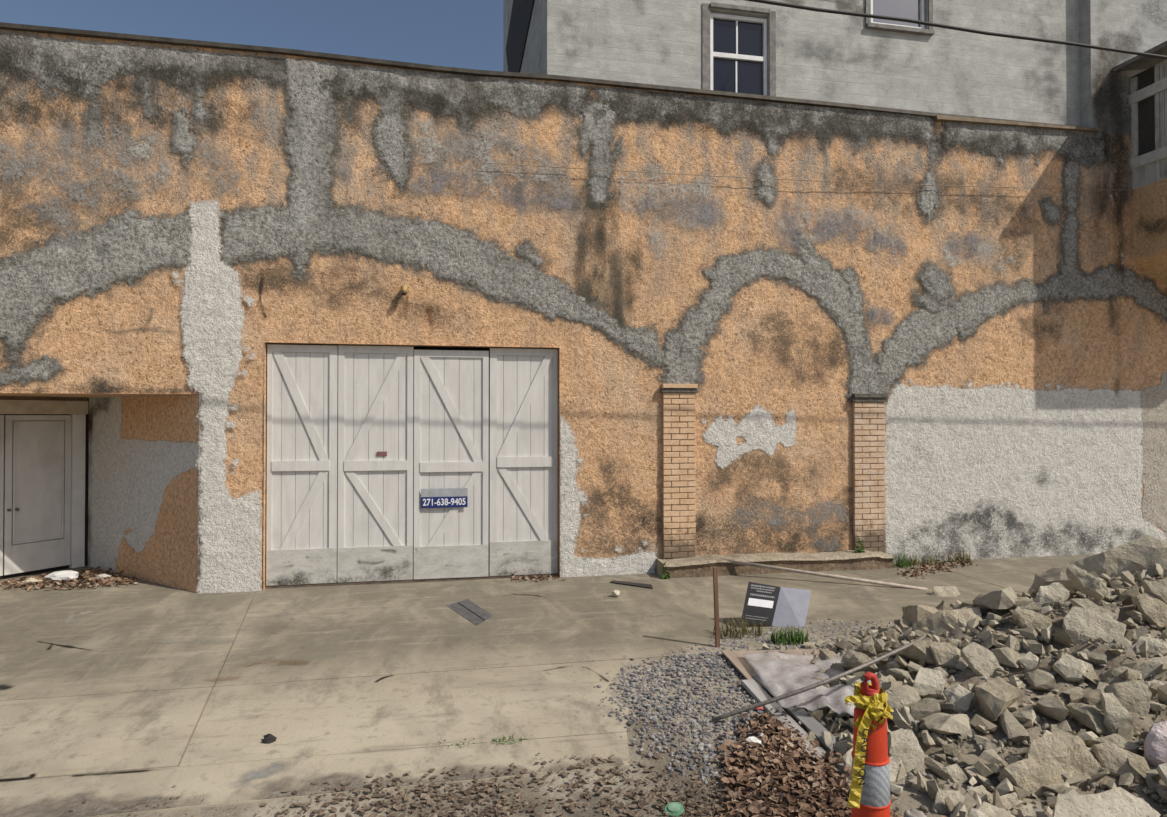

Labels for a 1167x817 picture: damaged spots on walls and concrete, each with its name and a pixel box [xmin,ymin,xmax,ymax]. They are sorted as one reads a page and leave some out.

damp [0,52,262,134]
damp [472,129,549,196]
damp [319,75,1051,163]
damp [1071,35,1135,273]
damp [581,190,641,327]
damp [935,176,1034,271]
peeling [0,33,1167,594]
damp [896,504,1144,562]